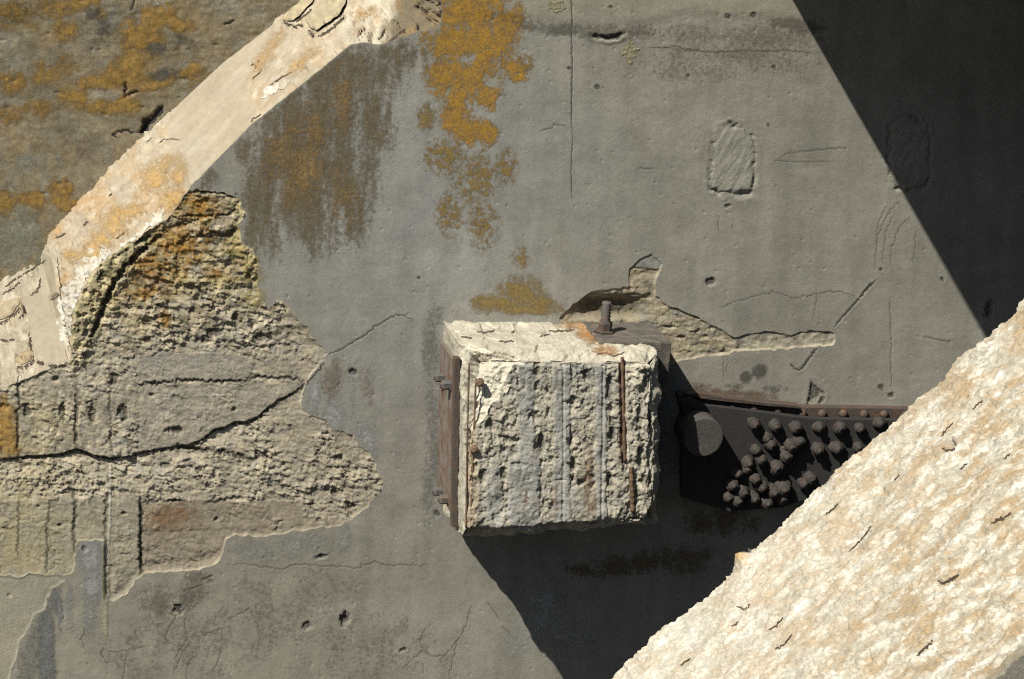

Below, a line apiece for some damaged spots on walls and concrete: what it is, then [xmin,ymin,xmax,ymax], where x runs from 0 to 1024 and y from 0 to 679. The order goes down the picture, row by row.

damp [234,41,428,254]
crack [540,0,573,198]
spalling [0,188,383,679]
crack [0,314,411,460]
rust [564,322,617,354]
spalling [559,253,876,371]